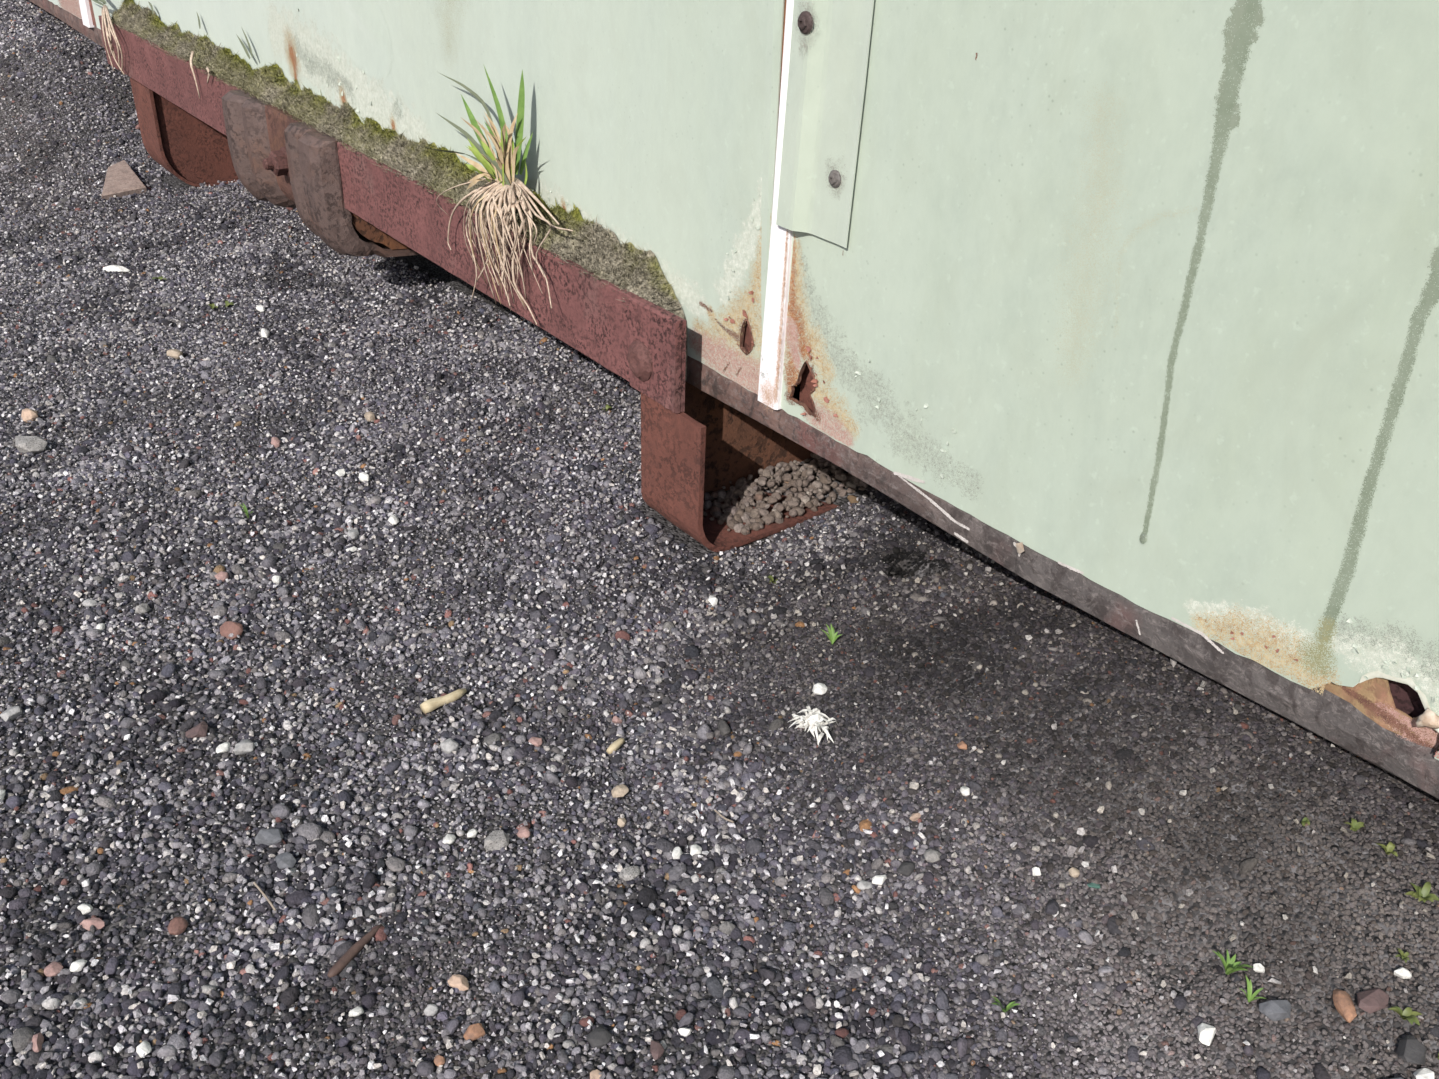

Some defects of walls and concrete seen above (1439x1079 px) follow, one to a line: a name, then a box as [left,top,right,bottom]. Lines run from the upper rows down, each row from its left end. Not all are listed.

corrosion [283,27,301,83]
corrosion [687,211,860,448]
peeling [794,243,985,501]
water stain [1113,0,1266,544]
water stain [1295,247,1439,681]
peeling [1184,597,1439,729]
corrosion [1189,603,1439,759]